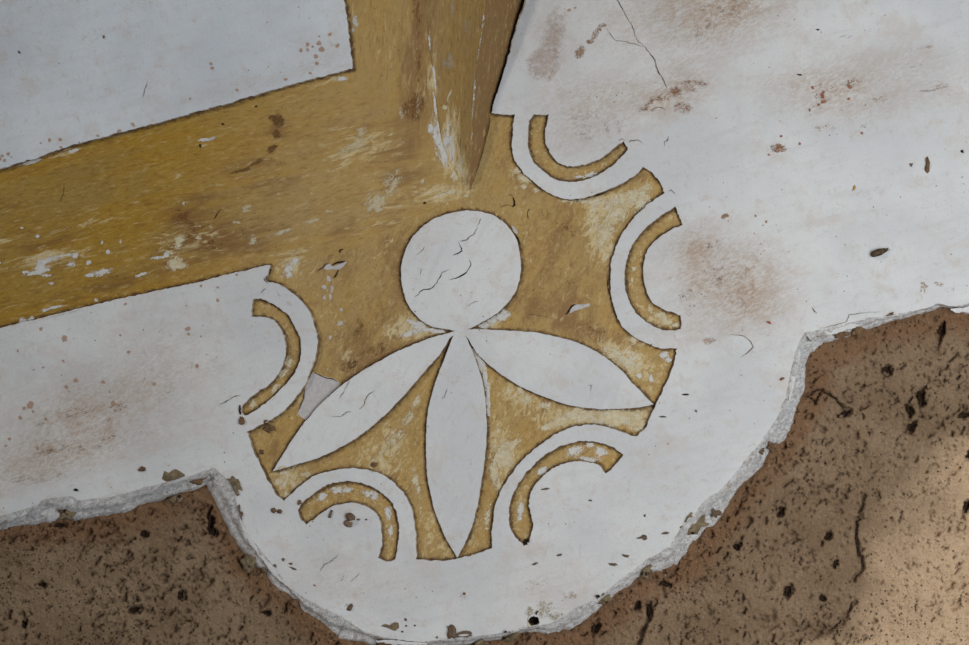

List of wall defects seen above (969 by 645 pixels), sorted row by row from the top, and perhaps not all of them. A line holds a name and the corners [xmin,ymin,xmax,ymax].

crack [607,0,667,87]
peeling [22,252,113,285]
peeling [150,226,213,271]
crack [416,219,481,296]